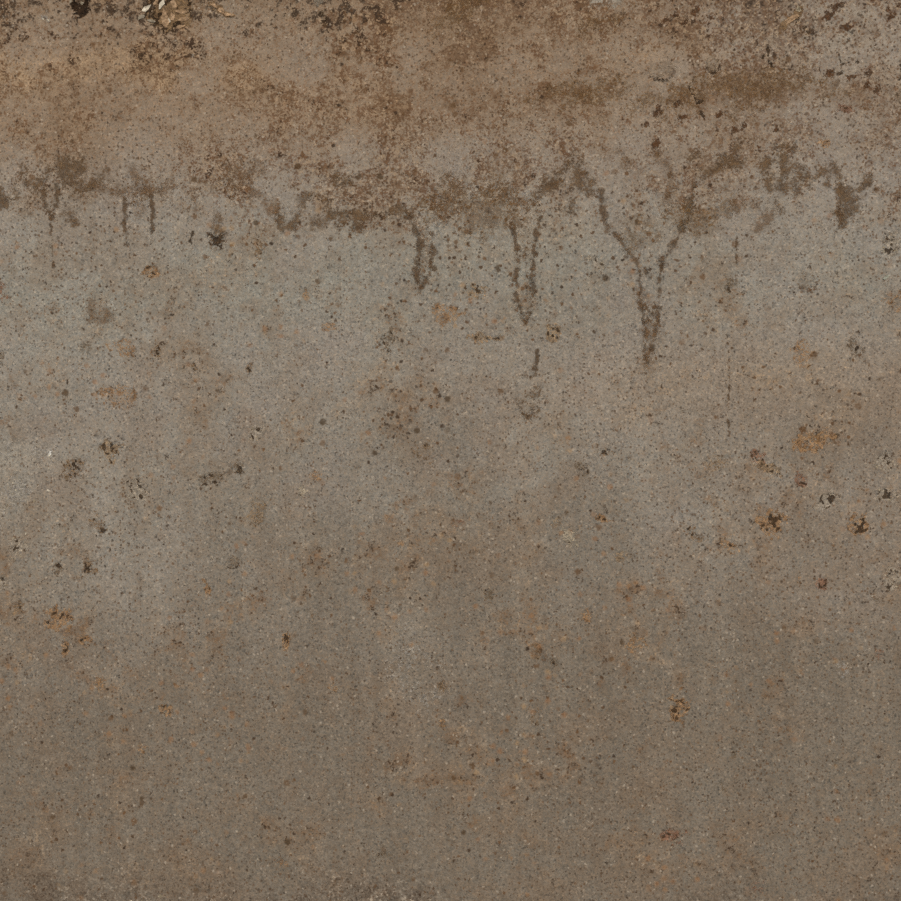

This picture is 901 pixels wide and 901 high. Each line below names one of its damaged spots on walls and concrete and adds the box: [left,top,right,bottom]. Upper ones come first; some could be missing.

spalling [663,0,714,25]
leakage [0,155,109,227]
leakage [207,213,228,250]
leakage [275,192,436,289]
leakage [510,215,543,324]
leakage [530,151,667,374]
leakage [670,138,746,246]
leakage [759,144,872,228]